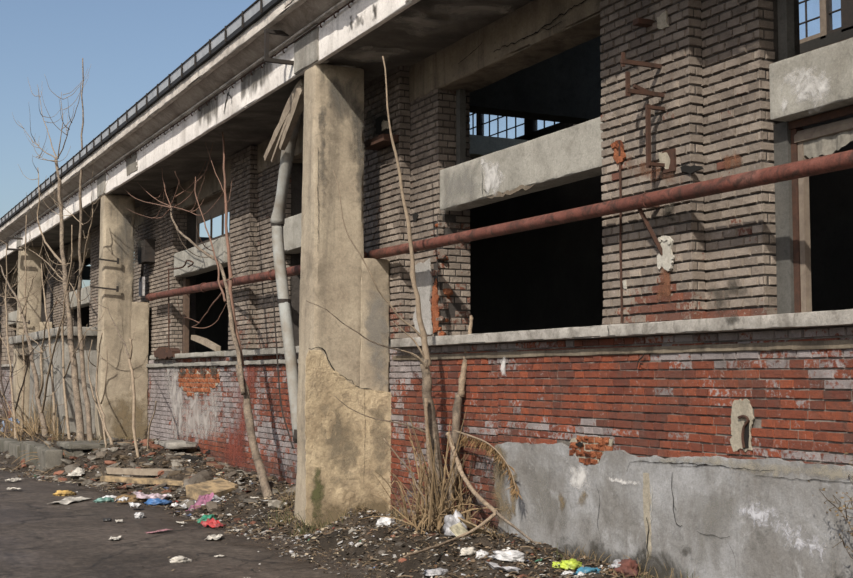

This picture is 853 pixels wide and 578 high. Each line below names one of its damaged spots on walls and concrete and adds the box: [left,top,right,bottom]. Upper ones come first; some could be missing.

crack [458,0,586,64]
spalling [154,347,180,360]
water stain [167,359,218,439]
spalling [178,367,221,397]
crack [309,347,372,415]
spalling [569,435,613,465]
crack [627,461,851,562]